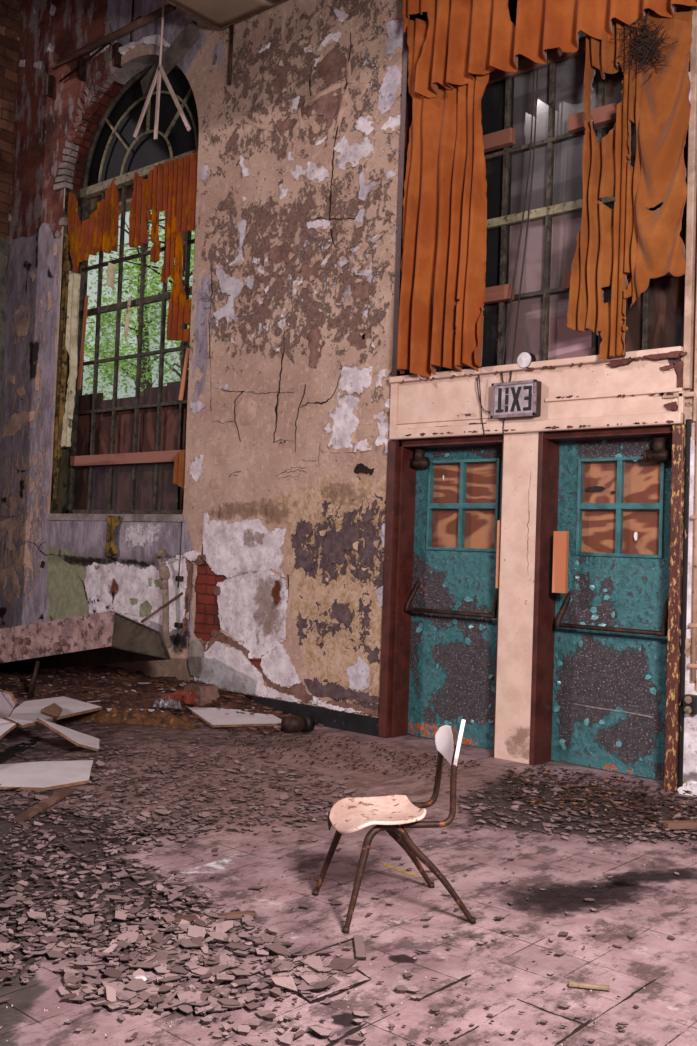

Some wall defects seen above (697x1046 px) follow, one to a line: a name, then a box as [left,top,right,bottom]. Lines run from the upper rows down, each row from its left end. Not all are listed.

spalling [0,0,171,256]
peeling [239,154,250,177]
crack [311,126,355,247]
peeling [271,6,404,229]
peeling [190,400,206,414]
crack [208,267,368,476]
peeling [210,219,397,480]
peeling [0,497,385,734]
peeling [416,605,497,646]
peeling [570,561,619,648]
peeling [677,437,697,797]